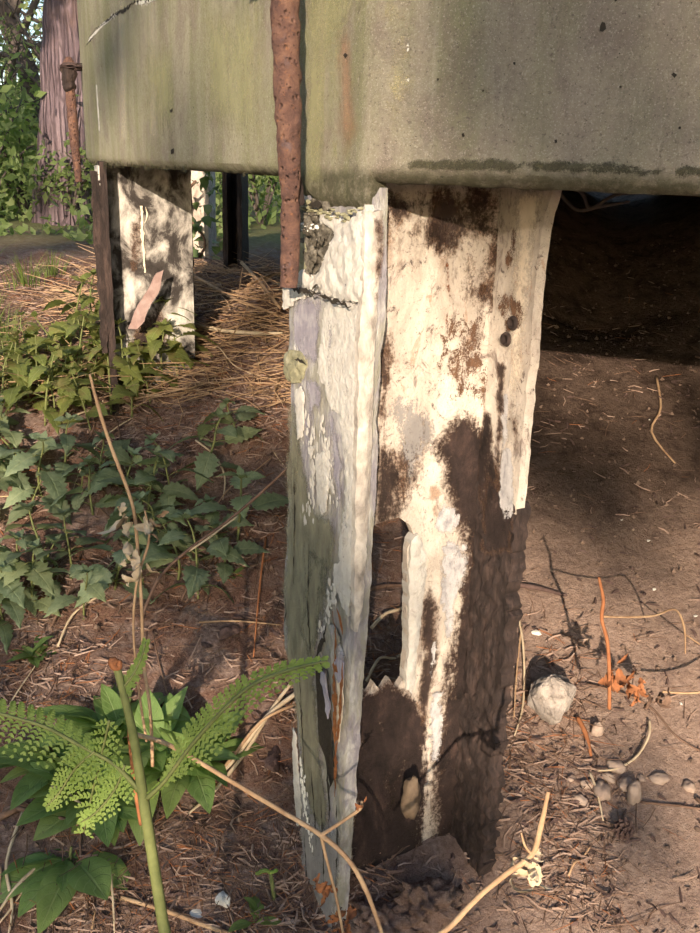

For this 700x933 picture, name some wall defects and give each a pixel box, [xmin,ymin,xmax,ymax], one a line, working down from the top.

crack [86,0,153,45]
peeling [282,288,309,310]
peeling [294,298,358,742]